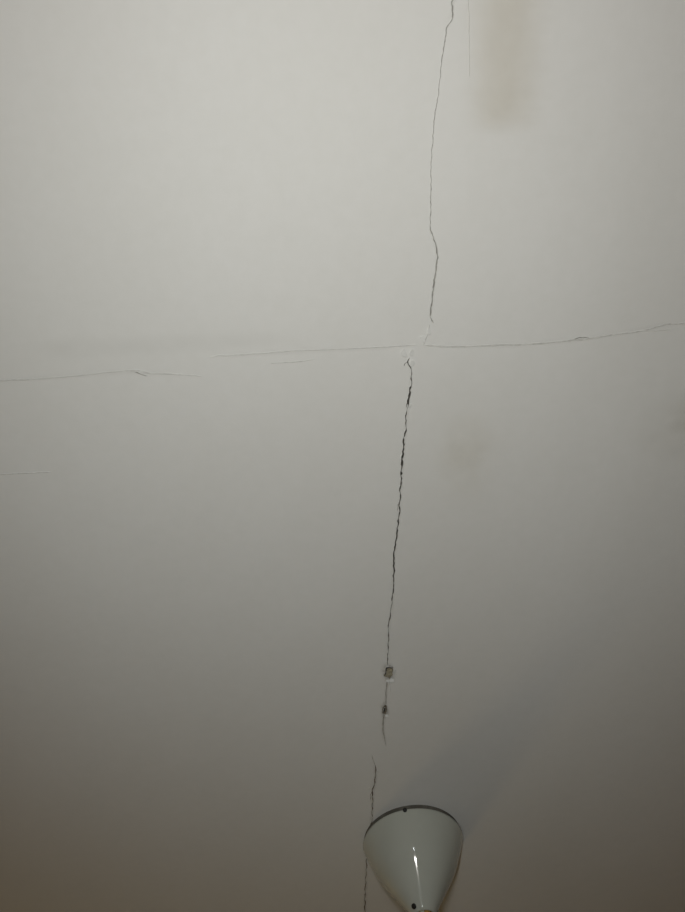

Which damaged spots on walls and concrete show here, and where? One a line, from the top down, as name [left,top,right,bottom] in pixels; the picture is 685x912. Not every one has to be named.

crack [209,0,685,825]
crack [362,858,370,912]